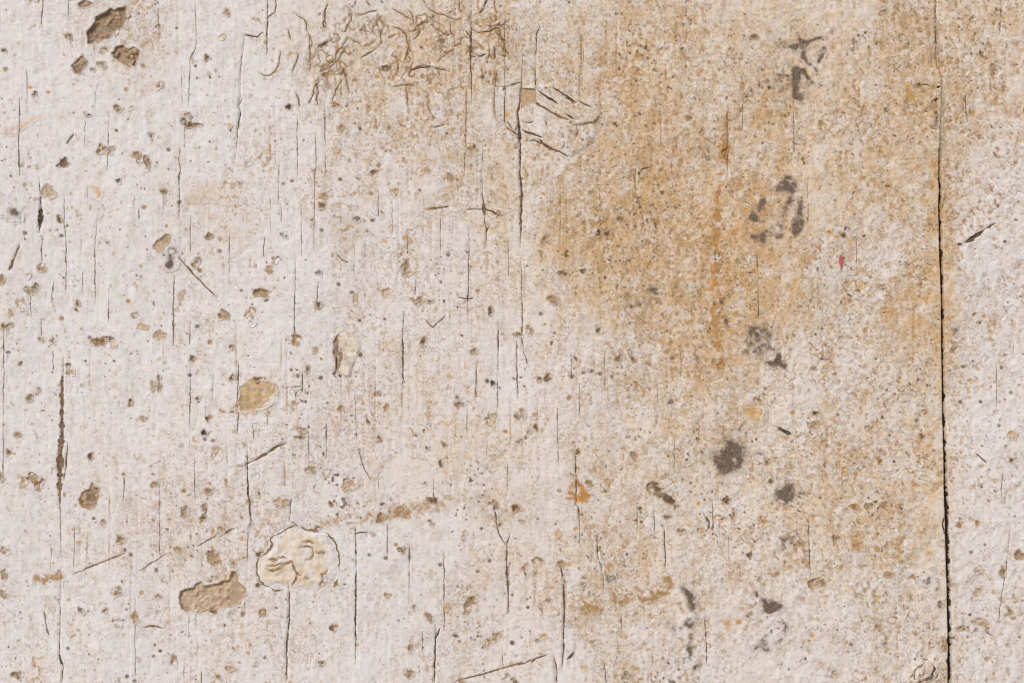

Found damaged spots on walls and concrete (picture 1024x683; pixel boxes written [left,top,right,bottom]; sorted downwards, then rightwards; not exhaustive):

crack [18,72,109,676]
spalling [79,482,99,510]
spalling [71,0,140,74]
spalling [178,550,262,615]
crack [459,25,540,408]
rust [560,469,598,532]
damp [469,0,1024,683]
crack [922,0,968,682]